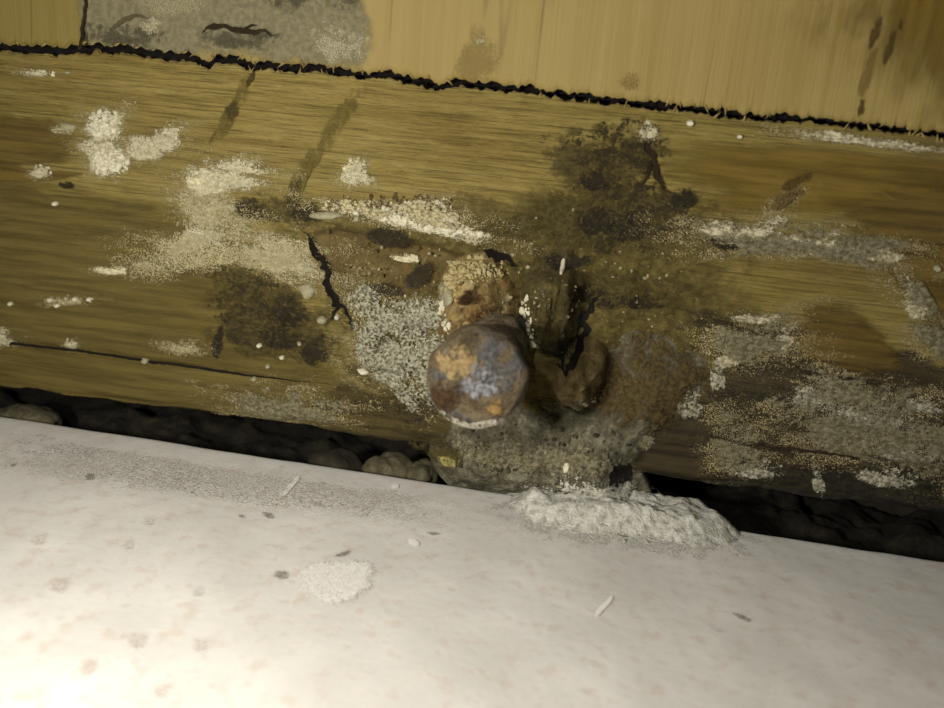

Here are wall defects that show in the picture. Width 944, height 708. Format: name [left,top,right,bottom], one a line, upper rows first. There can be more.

leakage [79,0,372,66]
crack [0,0,944,193]
crack [304,232,353,331]
leakage [0,71,944,513]
crack [546,296,601,377]
leakage [0,436,501,535]